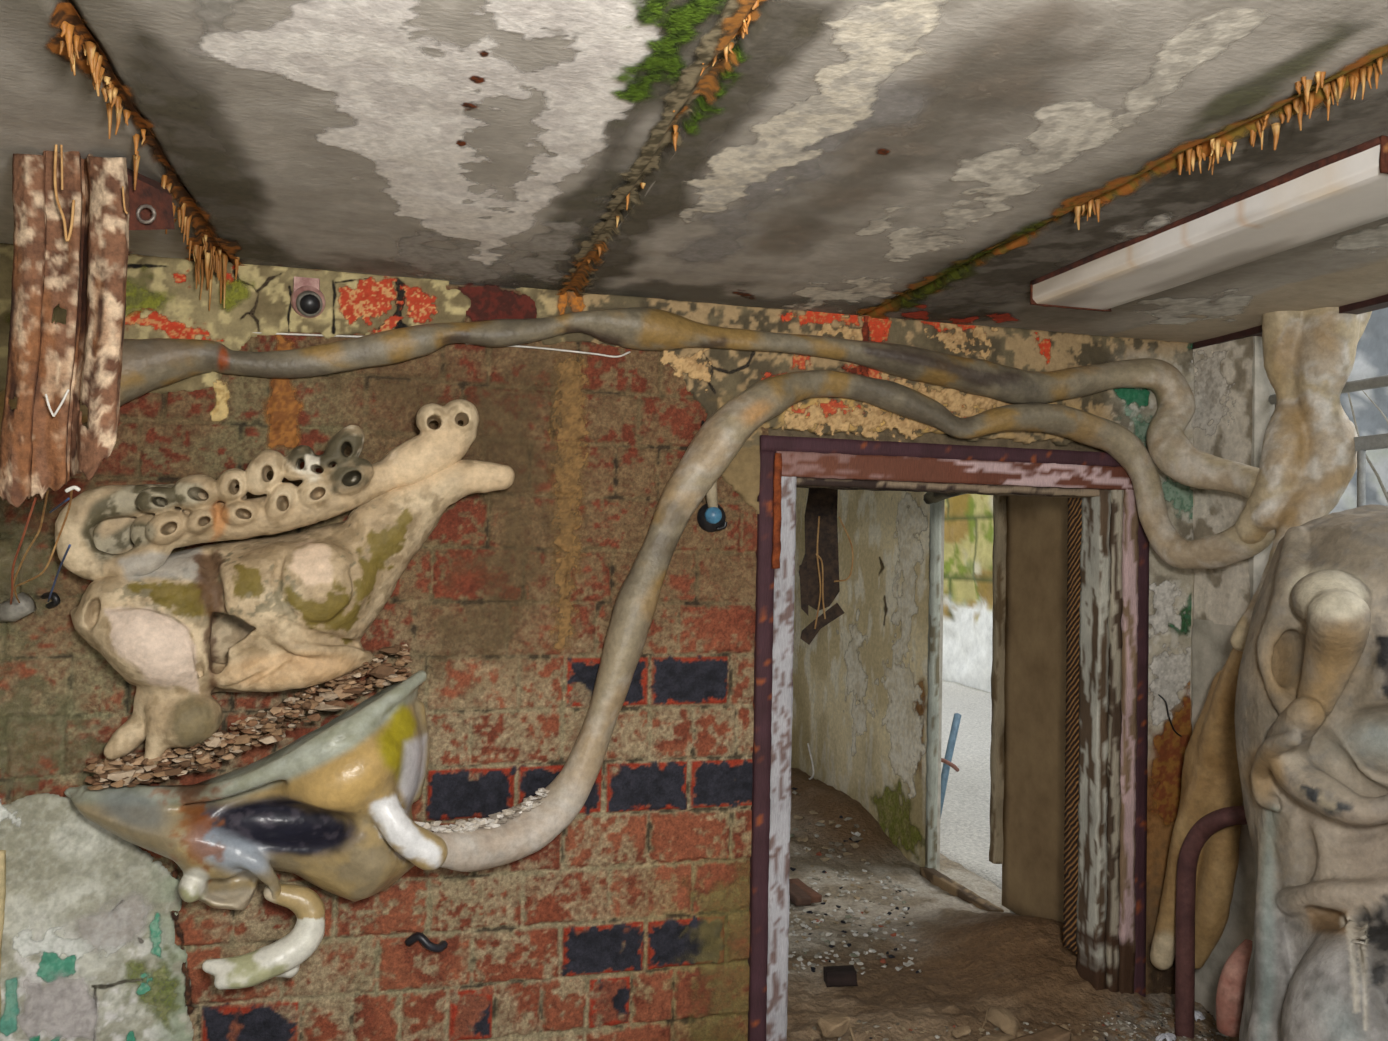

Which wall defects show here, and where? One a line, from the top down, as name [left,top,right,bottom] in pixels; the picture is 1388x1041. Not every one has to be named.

peeling [189,0,661,352]
damp [494,0,861,309]
damp [765,32,1056,251]
peeling [125,309,224,342]
crack [232,270,292,332]
spalling [0,340,712,832]
spalling [149,476,758,1041]
peeling [837,493,928,799]
rust [1147,681,1191,826]
peeling [1149,581,1191,725]
peeling [0,977,61,1041]
peeling [13,927,125,983]